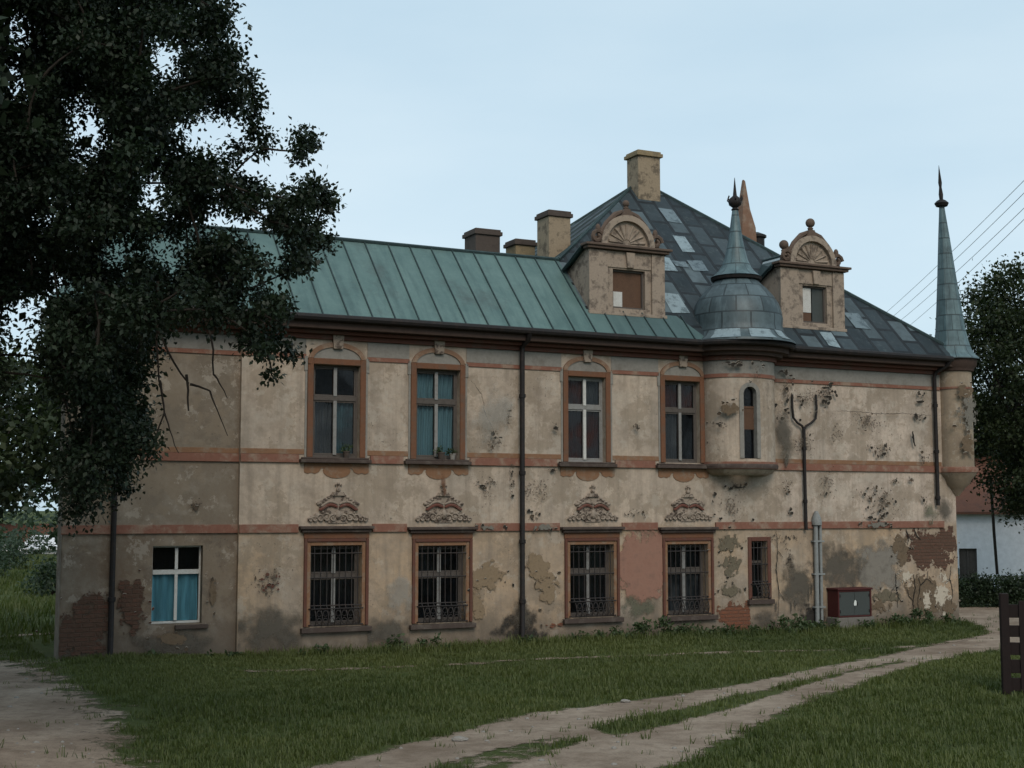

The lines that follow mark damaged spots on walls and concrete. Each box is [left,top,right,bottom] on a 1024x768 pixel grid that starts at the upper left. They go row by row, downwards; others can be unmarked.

flaking render [712,398,744,428]
flaking render [775,369,838,422]
flaking render [58,569,154,659]
flaking render [251,566,293,597]
flaking render [465,556,514,621]
damp [492,606,547,640]
flaking render [525,553,561,611]
flaking render [705,482,759,630]
flaking render [852,477,961,621]